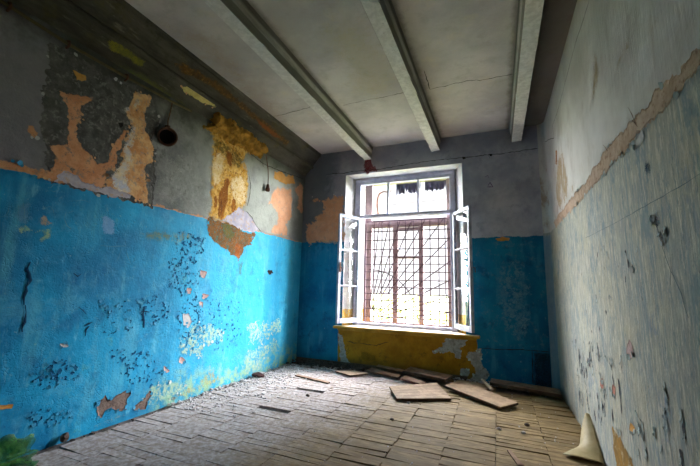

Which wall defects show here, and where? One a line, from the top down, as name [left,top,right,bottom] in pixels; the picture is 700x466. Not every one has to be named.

crack [326,2,589,175]
peeling [0,43,160,209]
flaking render [202,112,268,159]
peeling [554,48,700,228]
peeling [223,207,258,232]
peeling [306,194,346,247]
crack [21,262,32,332]
peeling [98,230,281,374]
flaking render [95,349,170,419]
peeling [432,338,489,382]
peeling [572,326,668,466]